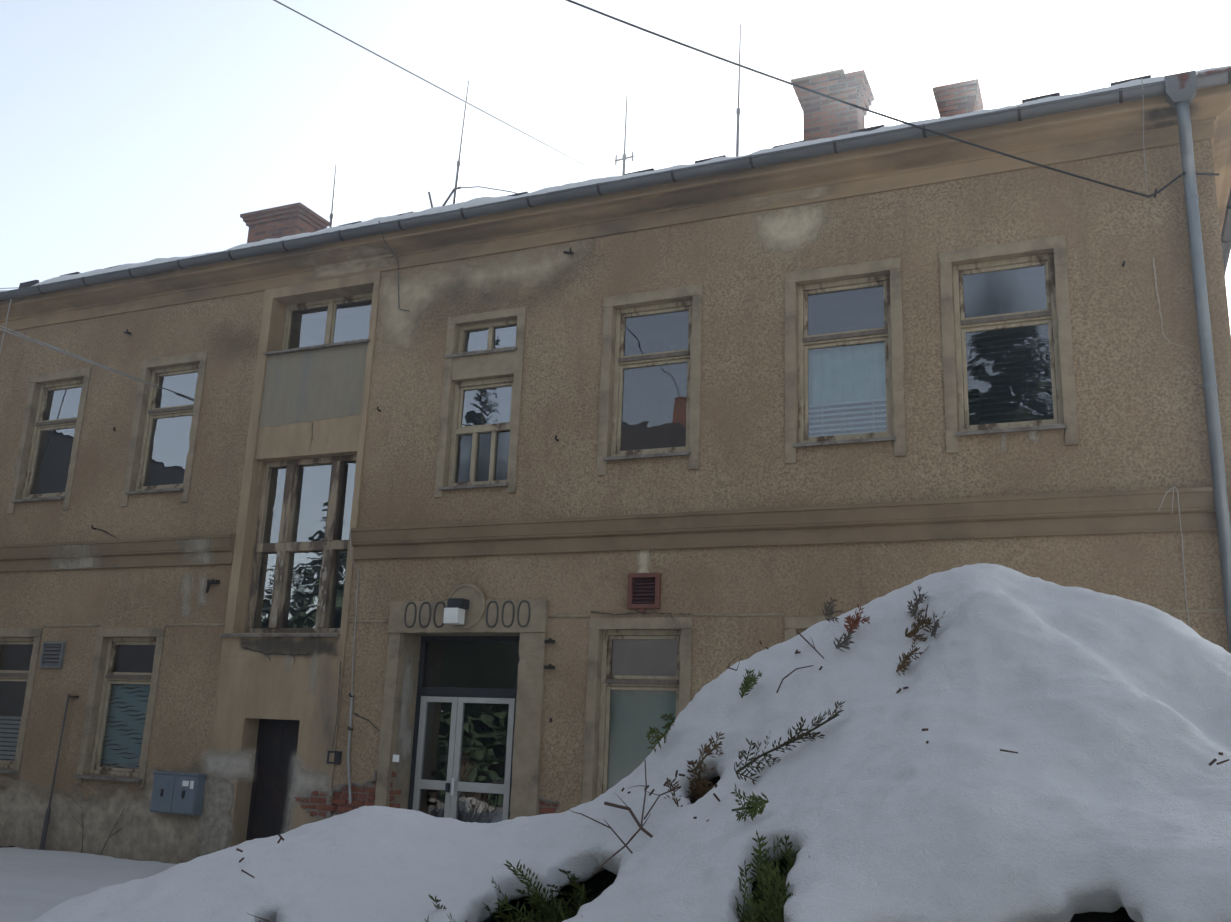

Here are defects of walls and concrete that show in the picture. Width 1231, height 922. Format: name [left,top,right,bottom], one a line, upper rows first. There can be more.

flaking render [294,657,413,818]